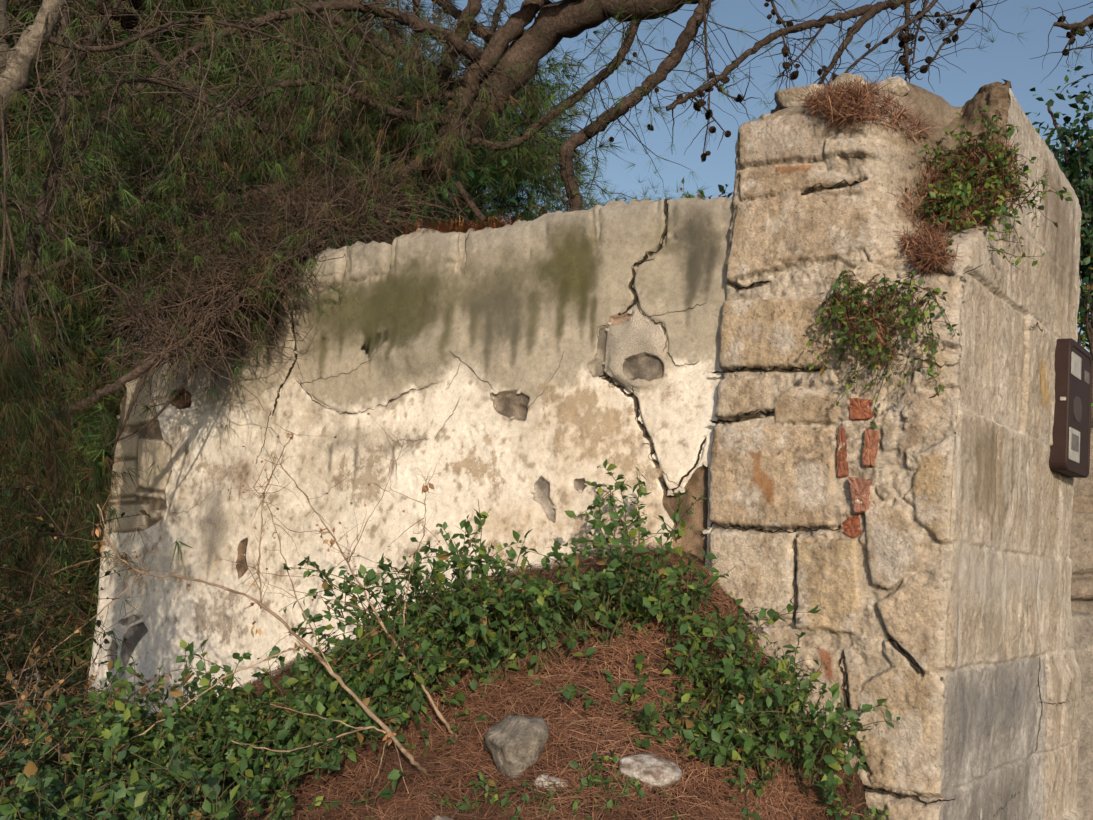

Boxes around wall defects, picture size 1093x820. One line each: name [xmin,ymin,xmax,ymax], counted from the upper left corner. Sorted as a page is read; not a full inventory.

water stain [679,216,714,306]
crack [256,301,494,463]
water stain [440,304,453,349]
water stain [471,284,536,358]
spalling [490,389,529,421]
water stain [558,286,566,336]
water stain [580,289,596,337]
spalling [623,352,670,401]
crack [594,198,821,499]
spalling [105,375,191,533]
spalling [532,476,557,523]
spalling [570,461,709,565]